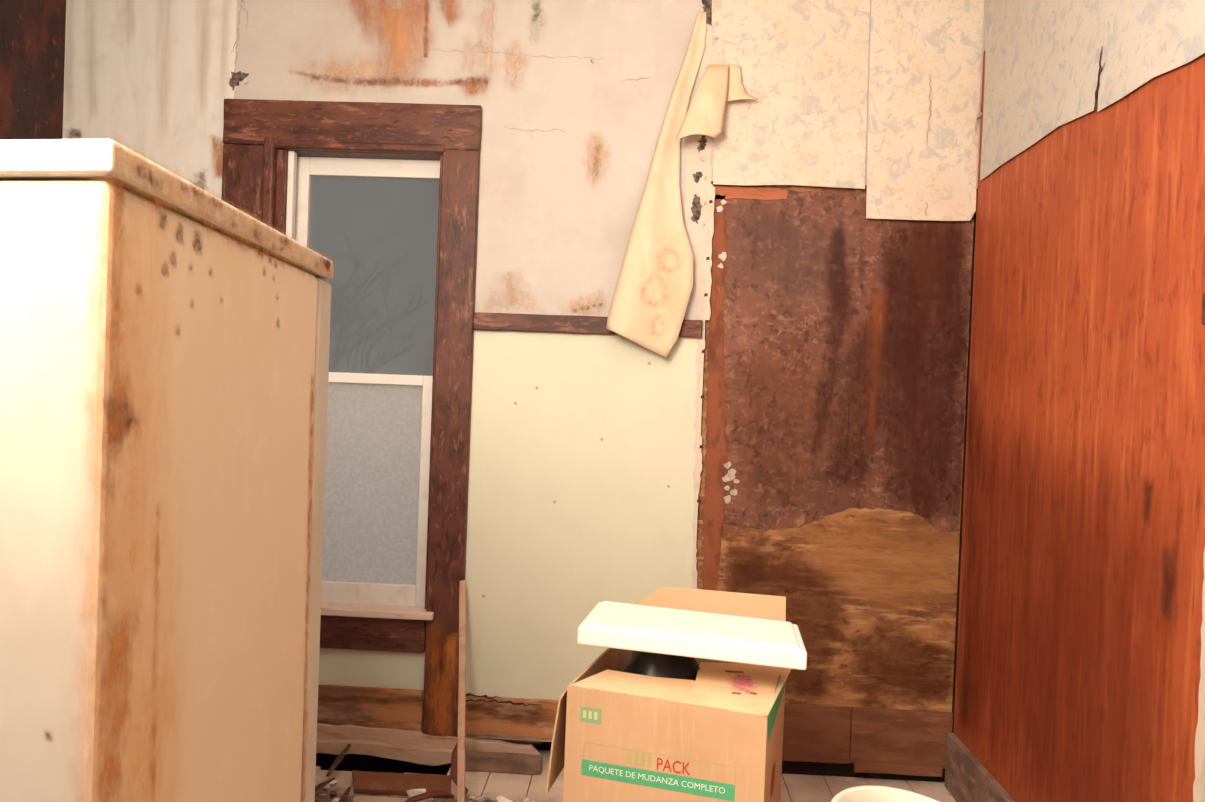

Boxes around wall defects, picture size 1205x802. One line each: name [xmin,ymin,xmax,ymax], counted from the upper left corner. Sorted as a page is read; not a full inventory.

crack [1094,48,1105,113]
spalling [687,135,727,226]
rust [107,382,132,445]
peeling [722,462,739,504]
damp [730,519,955,699]